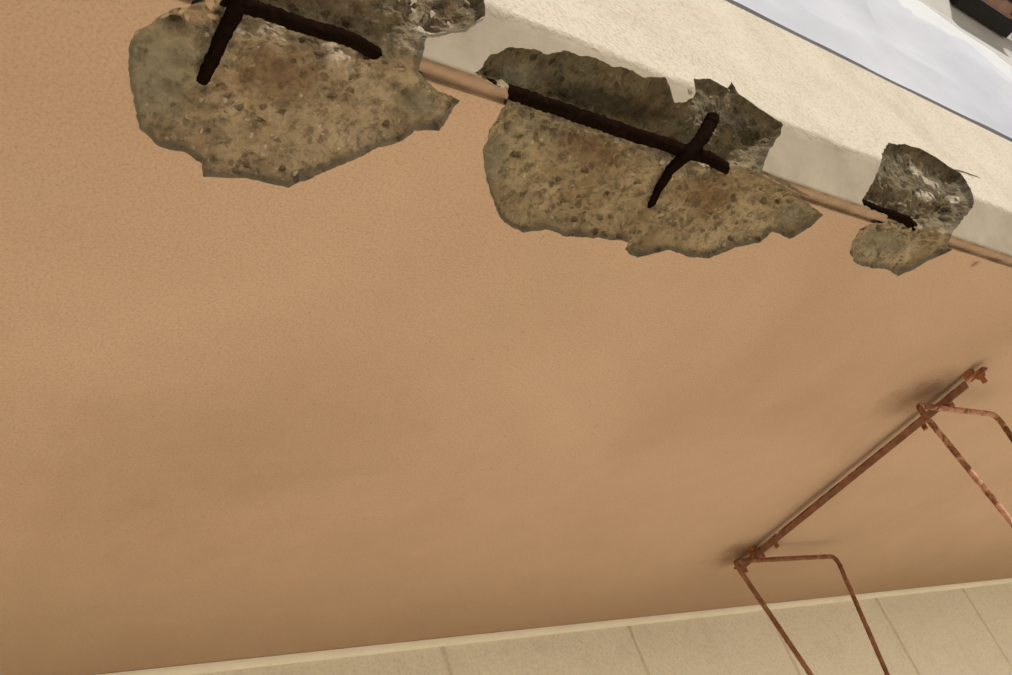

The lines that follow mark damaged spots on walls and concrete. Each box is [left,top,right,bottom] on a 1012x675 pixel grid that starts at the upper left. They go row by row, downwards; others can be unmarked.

spalling [128,0,485,188]
spalling [475,47,823,258]
spalling [850,143,974,276]